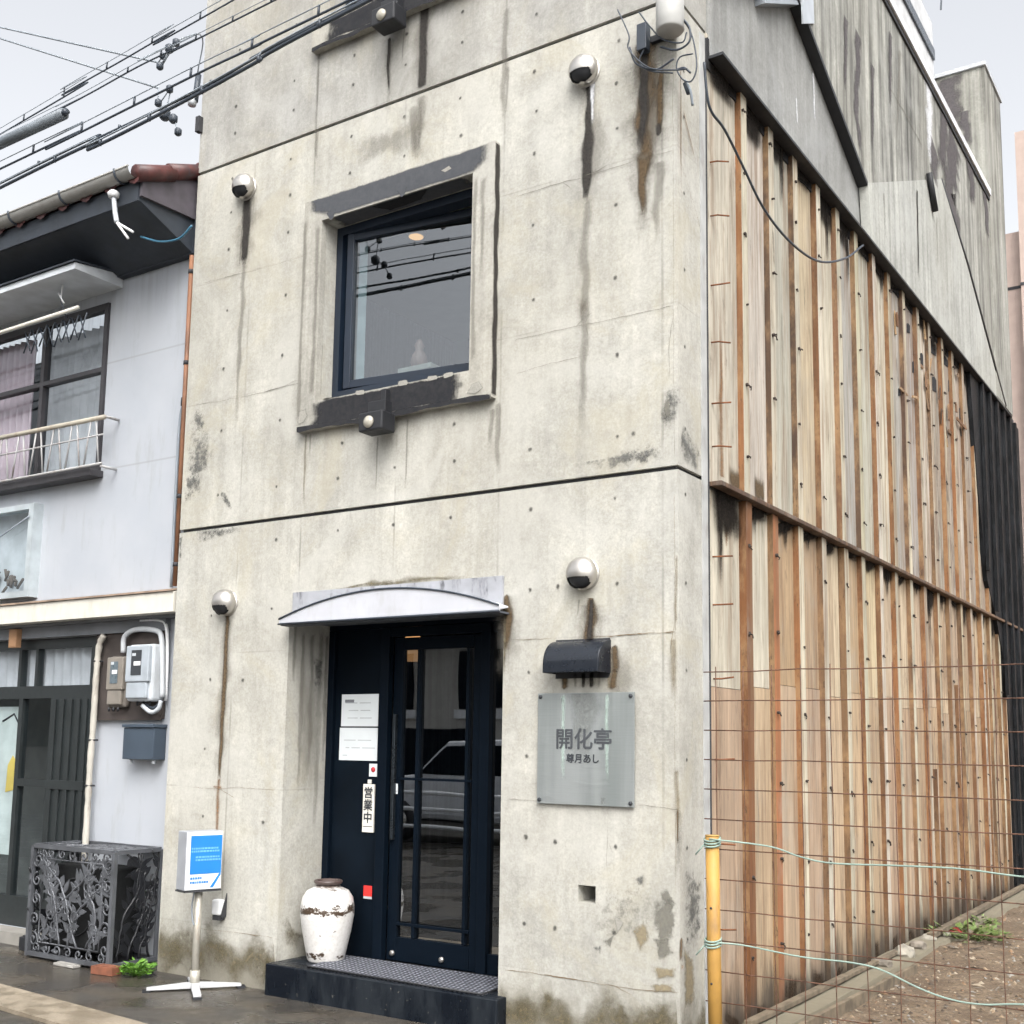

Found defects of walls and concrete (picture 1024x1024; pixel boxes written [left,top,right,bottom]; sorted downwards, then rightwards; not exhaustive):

water stain [403,0,435,87]
water stain [582,83,594,196]
water stain [241,199,250,259]
corrosion [719,353,739,488]
water stain [712,487,767,570]
corrosion [755,478,764,501]
water stain [778,521,835,555]
corrosion [584,598,597,641]
water stain [848,552,995,637]
corrosion [608,646,619,688]
spalling [634,891,694,1003]
spalling [686,883,700,937]